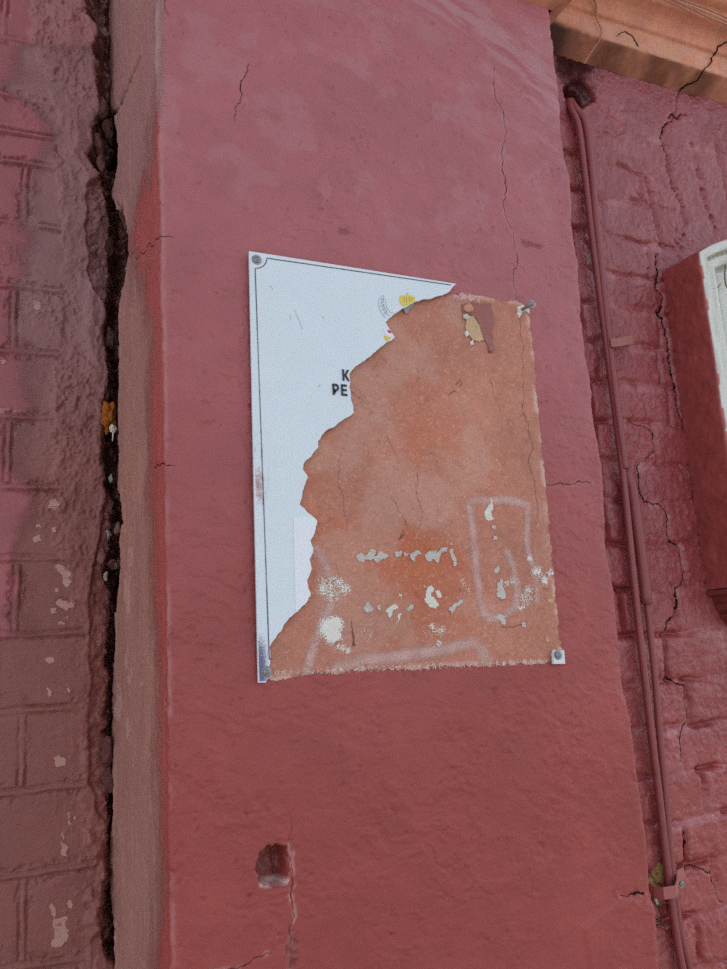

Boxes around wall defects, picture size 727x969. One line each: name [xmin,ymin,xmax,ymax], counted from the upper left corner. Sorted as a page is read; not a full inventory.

crack [98,8,110,71]
crack [93,91,173,271]
crack [660,41,727,192]
crack [105,292,119,351]
crack [654,256,683,425]
crack [96,431,121,603]
crack [625,418,684,635]
crack [101,735,114,809]
crack [664,676,698,774]
spalling [254,843,291,889]